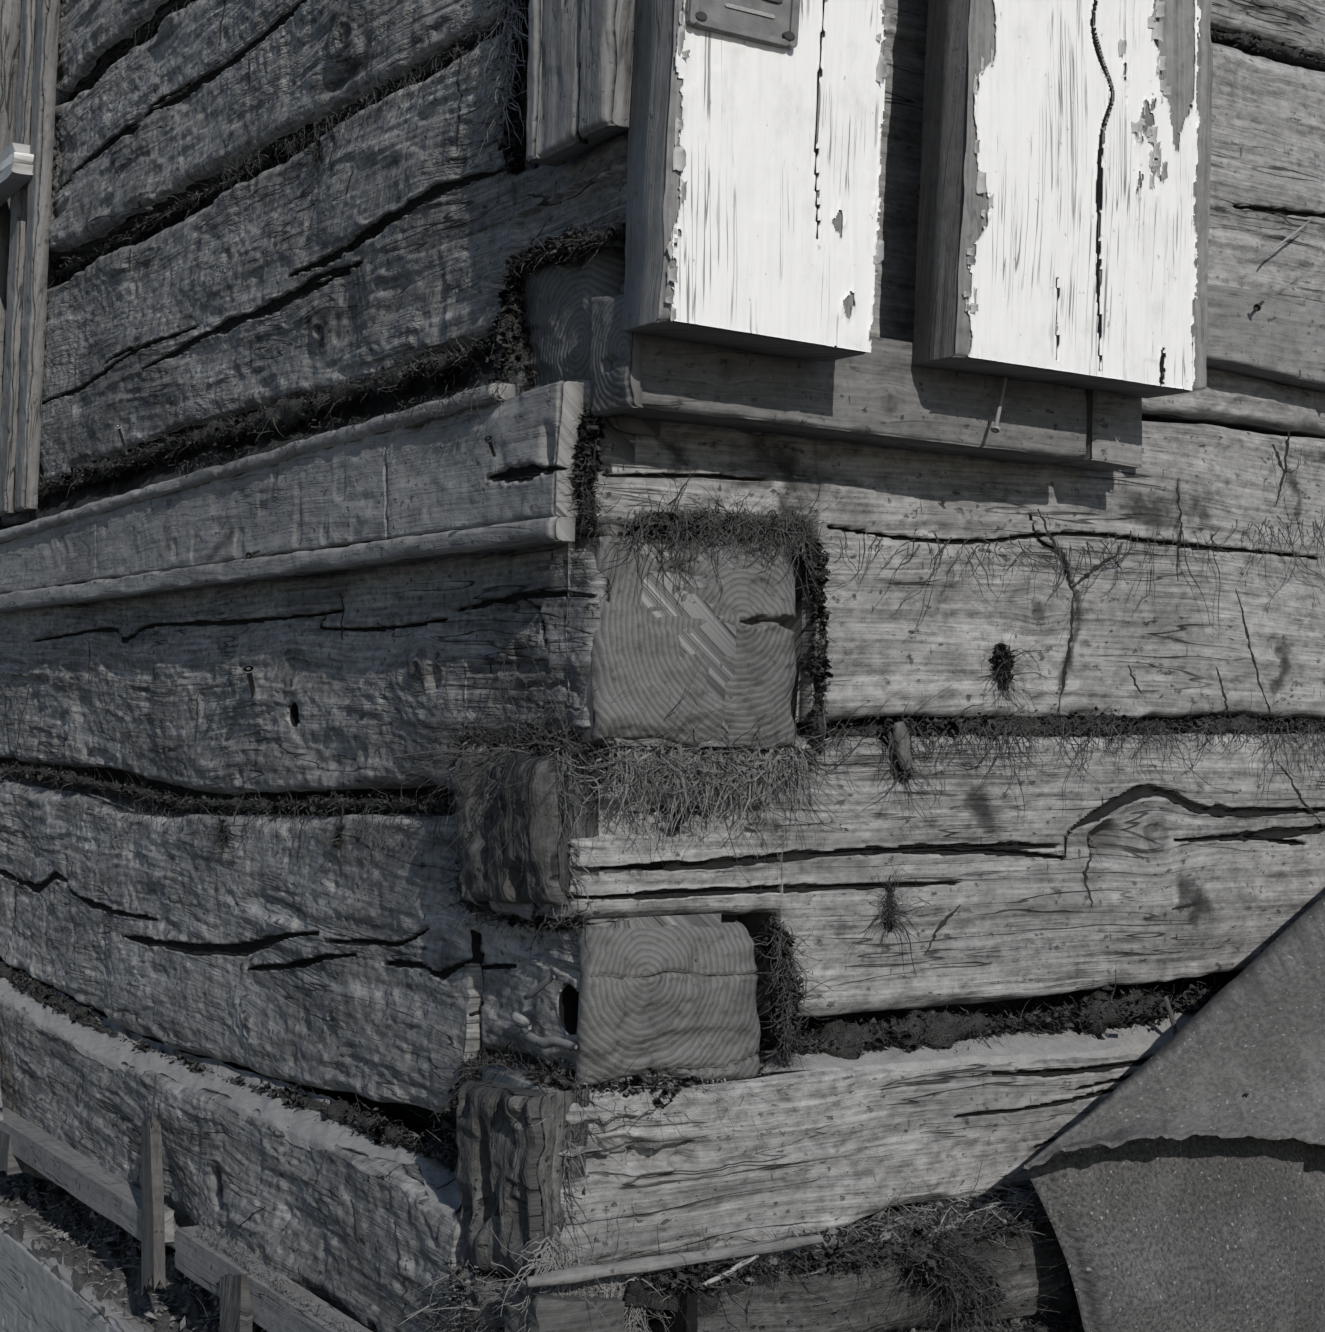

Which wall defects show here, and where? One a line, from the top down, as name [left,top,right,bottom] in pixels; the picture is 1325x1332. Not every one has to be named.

peeling [677,11,690,58]
peeling [876,0,890,84]
peeling [1118,39,1127,56]
crack [58,0,308,192]
peeling [1131,0,1172,189]
peeling [673,117,687,204]
crack [42,168,507,405]
peeling [873,239,884,264]
crack [827,514,1317,585]
crack [568,784,1325,900]
crack [0,870,517,1059]
crack [954,1057,1151,1148]